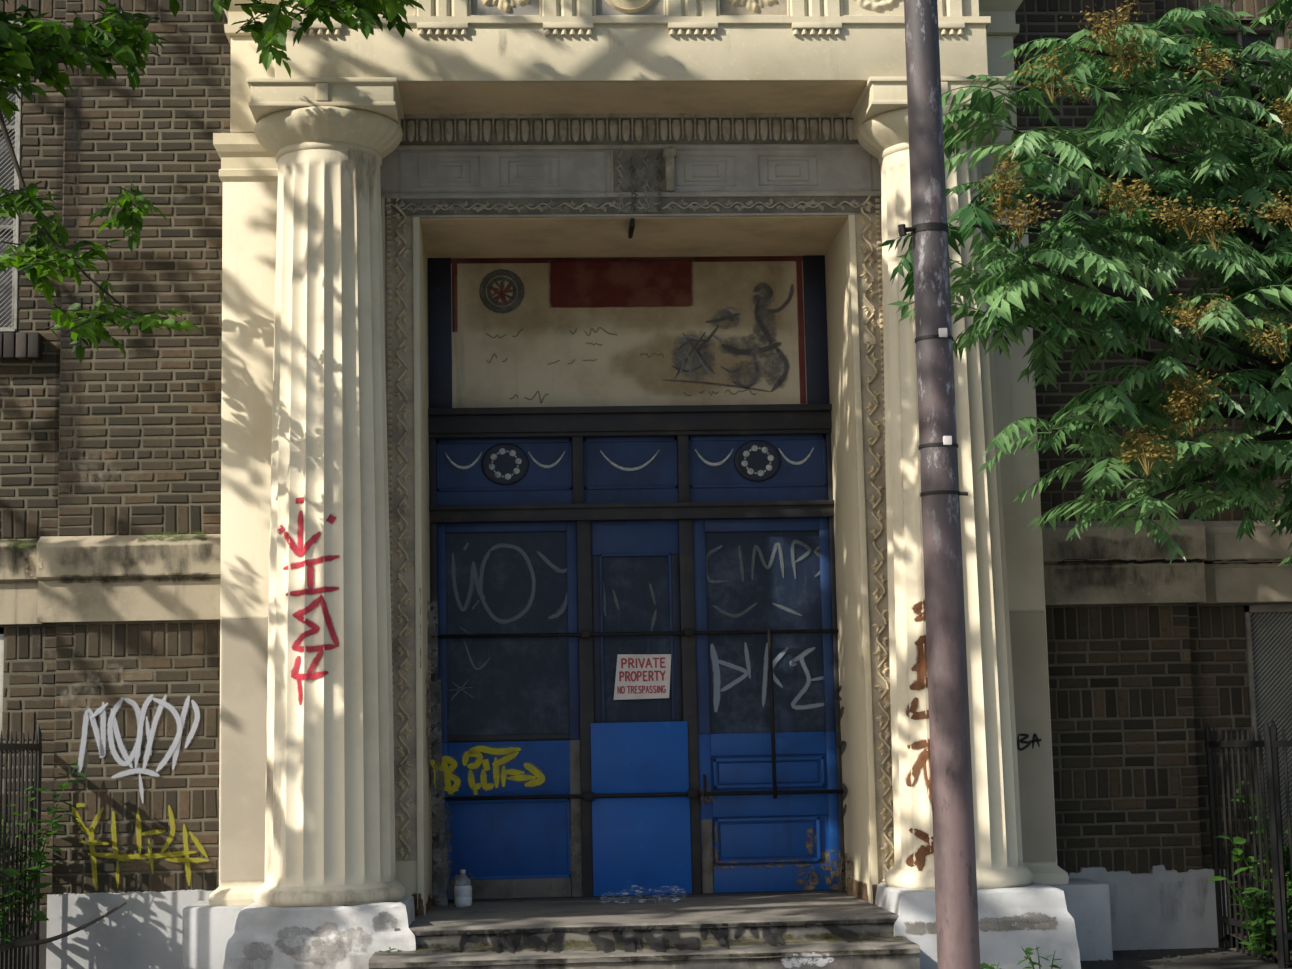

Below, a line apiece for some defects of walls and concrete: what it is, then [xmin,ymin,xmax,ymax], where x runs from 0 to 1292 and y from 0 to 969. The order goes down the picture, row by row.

water stain [0,546,31,575]
water stain [62,543,210,583]
spalling [411,588,478,916]
peeling [243,912,397,964]